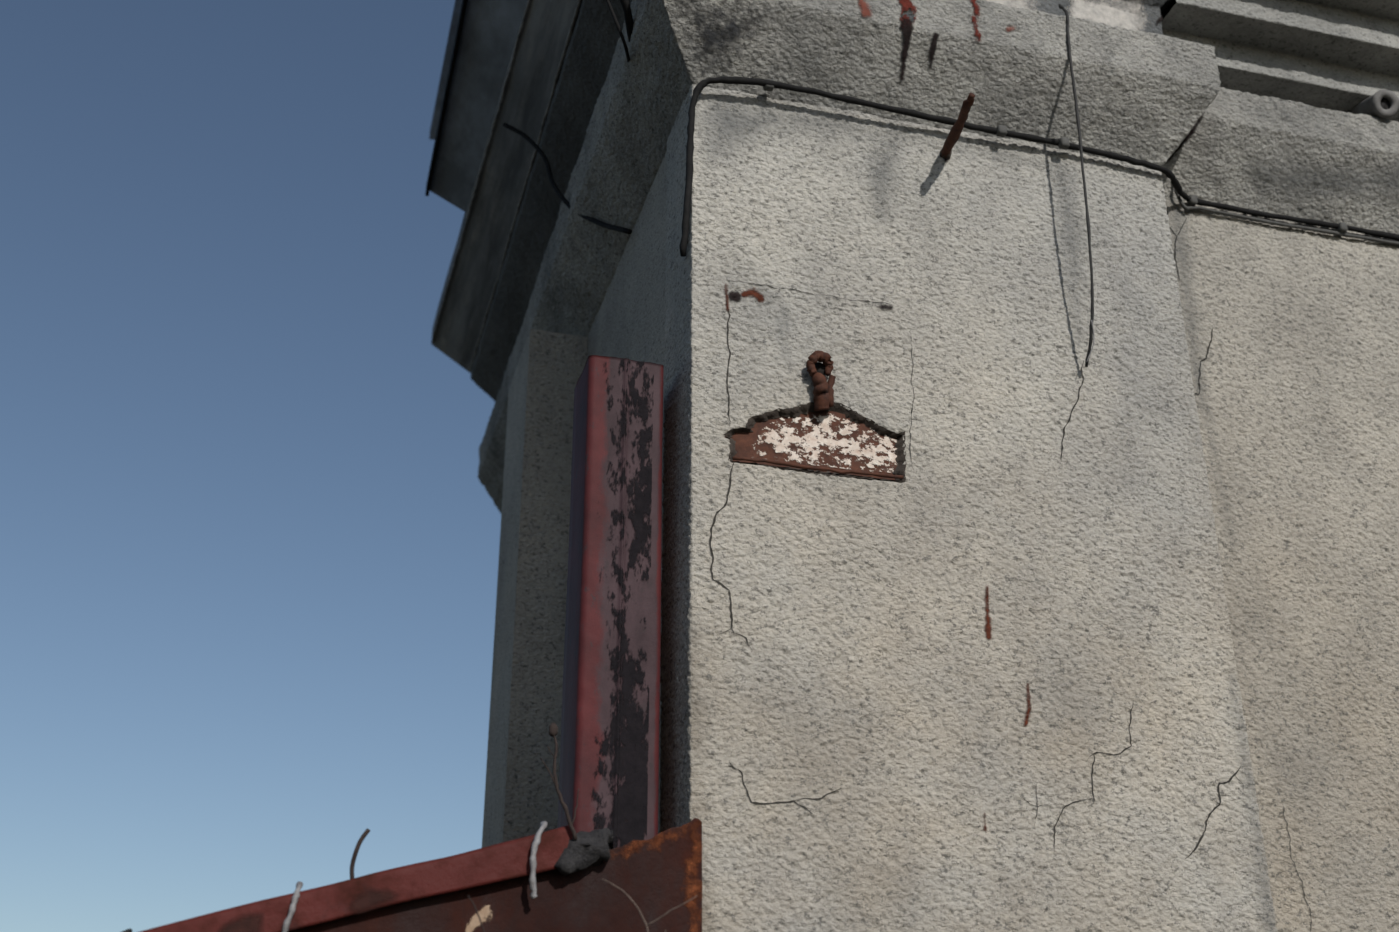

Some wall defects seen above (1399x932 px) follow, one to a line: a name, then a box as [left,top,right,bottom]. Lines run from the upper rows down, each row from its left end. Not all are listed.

crack [1165,116,1202,164]
crack [1166,204,1187,277]
crack [726,280,894,426]
peeling [723,402,906,482]
crack [908,340,916,462]
crack [1061,360,1084,458]
crack [1194,328,1213,395]
crack [705,461,750,647]
crack [1020,707,1133,849]
crack [1185,766,1243,859]
rust [220,915,262,932]
rust [624,824,702,932]